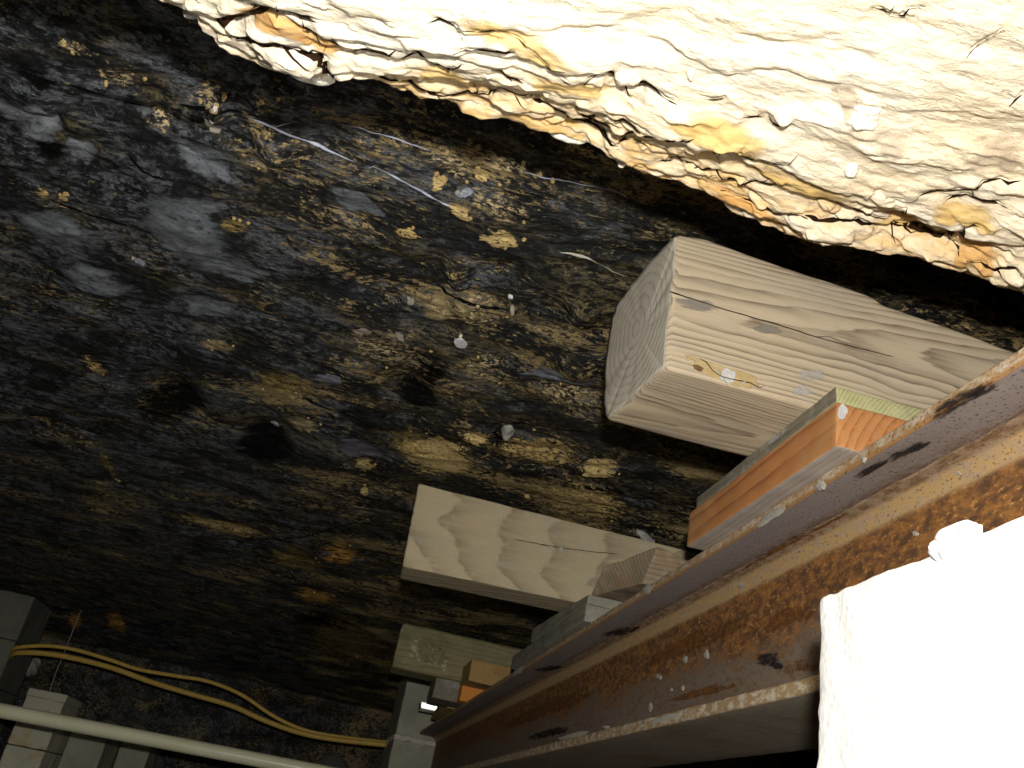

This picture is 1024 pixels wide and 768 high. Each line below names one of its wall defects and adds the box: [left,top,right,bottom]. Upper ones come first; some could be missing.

corrosion [744,515,844,570]
corrosion [673,685,734,701]